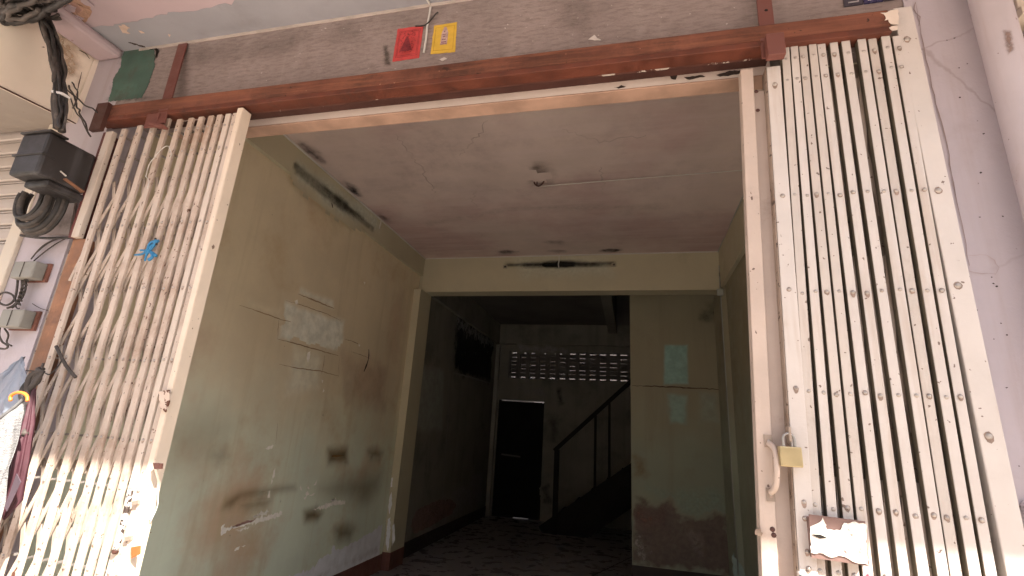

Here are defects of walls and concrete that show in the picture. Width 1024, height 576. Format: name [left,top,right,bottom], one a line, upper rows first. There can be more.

flaking render [63,0,449,102]
peeling [670,70,740,80]
peeling [882,9,899,31]
crack [913,2,999,274]
peeling [221,470,282,536]
peeling [289,477,395,576]